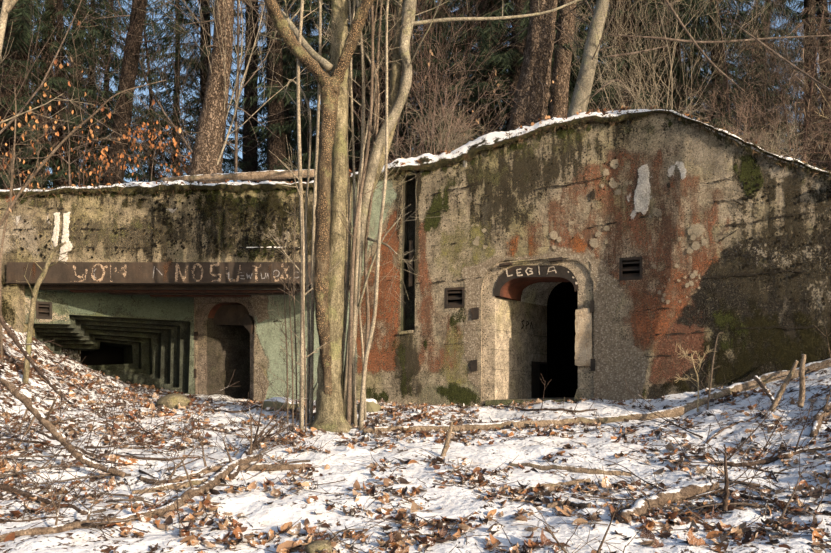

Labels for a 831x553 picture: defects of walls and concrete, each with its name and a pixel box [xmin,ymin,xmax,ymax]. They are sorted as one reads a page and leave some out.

water stain [47,212,72,262]